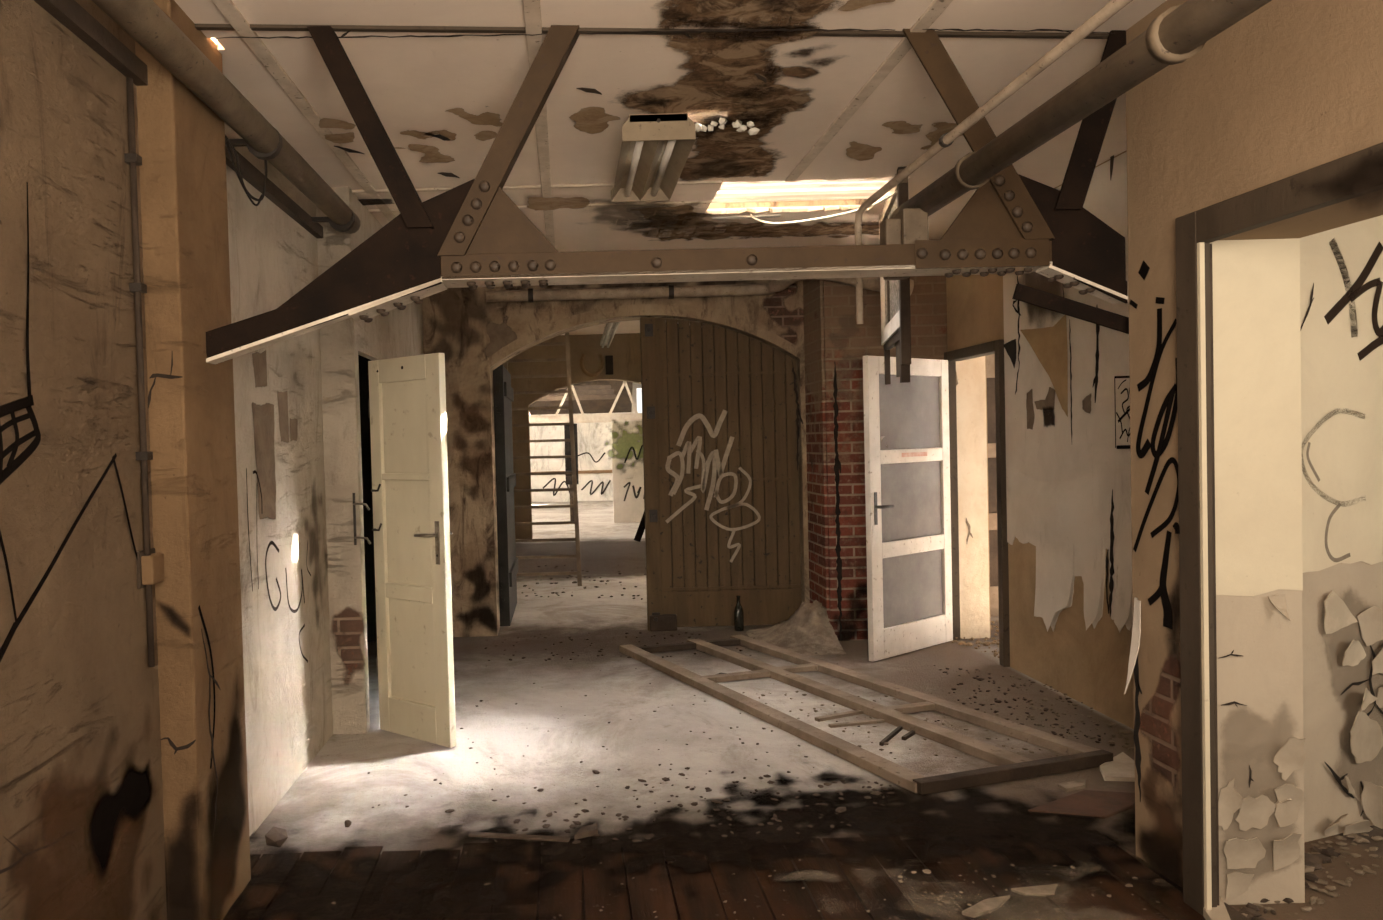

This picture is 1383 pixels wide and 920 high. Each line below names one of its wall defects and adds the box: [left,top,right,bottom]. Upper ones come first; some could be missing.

peeling [838,0,895,11]
leakage [621,0,839,181]
peeling [319,118,371,155]
peeling [394,108,502,178]
peeling [846,141,882,161]
peeling [882,121,963,150]
leakage [596,201,879,241]
spalling [644,205,859,218]
peeling [1026,387,1055,430]
spalling [332,607,365,684]
peeling [1124,598,1141,694]
peeling [1323,590,1383,836]